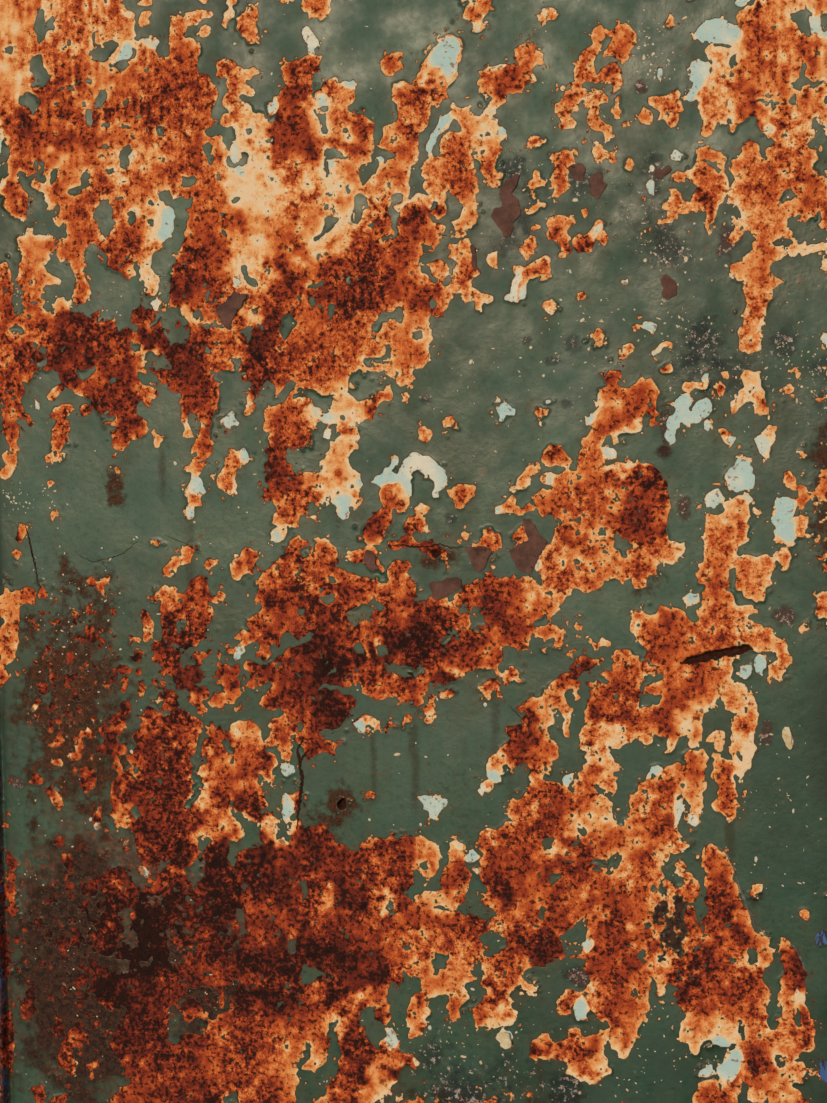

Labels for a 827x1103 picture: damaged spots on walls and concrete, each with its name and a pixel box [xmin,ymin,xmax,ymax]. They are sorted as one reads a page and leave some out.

rust [0,341,827,1103]
peeling [664,373,713,445]